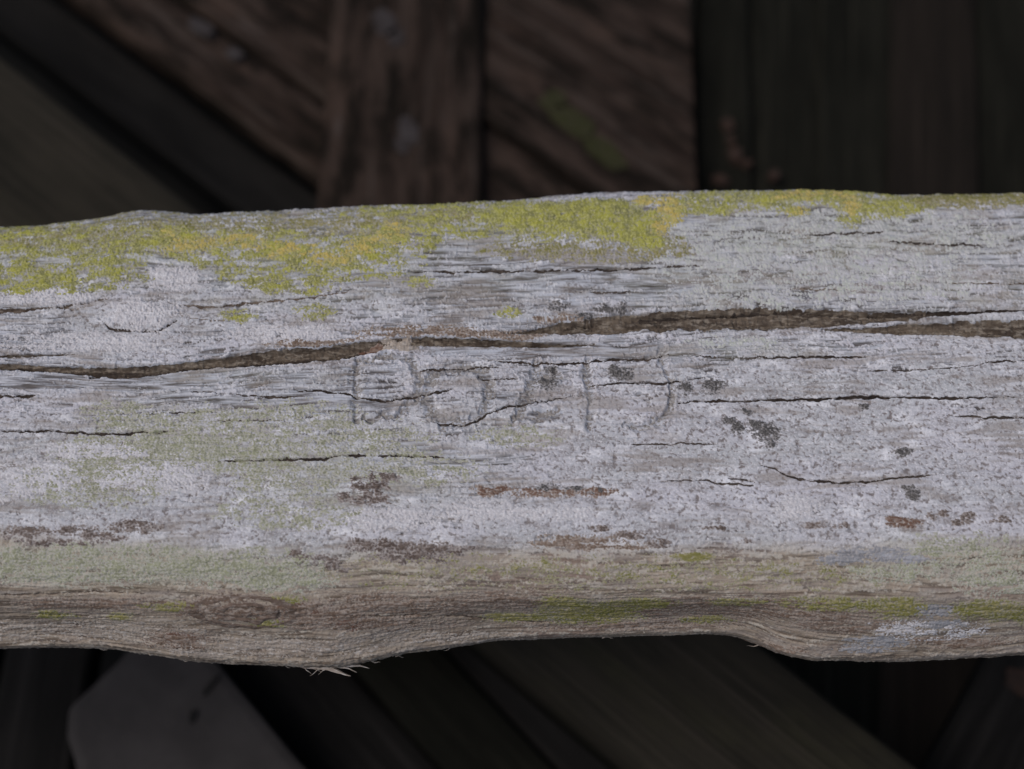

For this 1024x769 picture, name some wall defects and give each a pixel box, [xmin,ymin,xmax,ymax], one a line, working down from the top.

crack [0,264,1024,436]
crack [667,465,937,487]